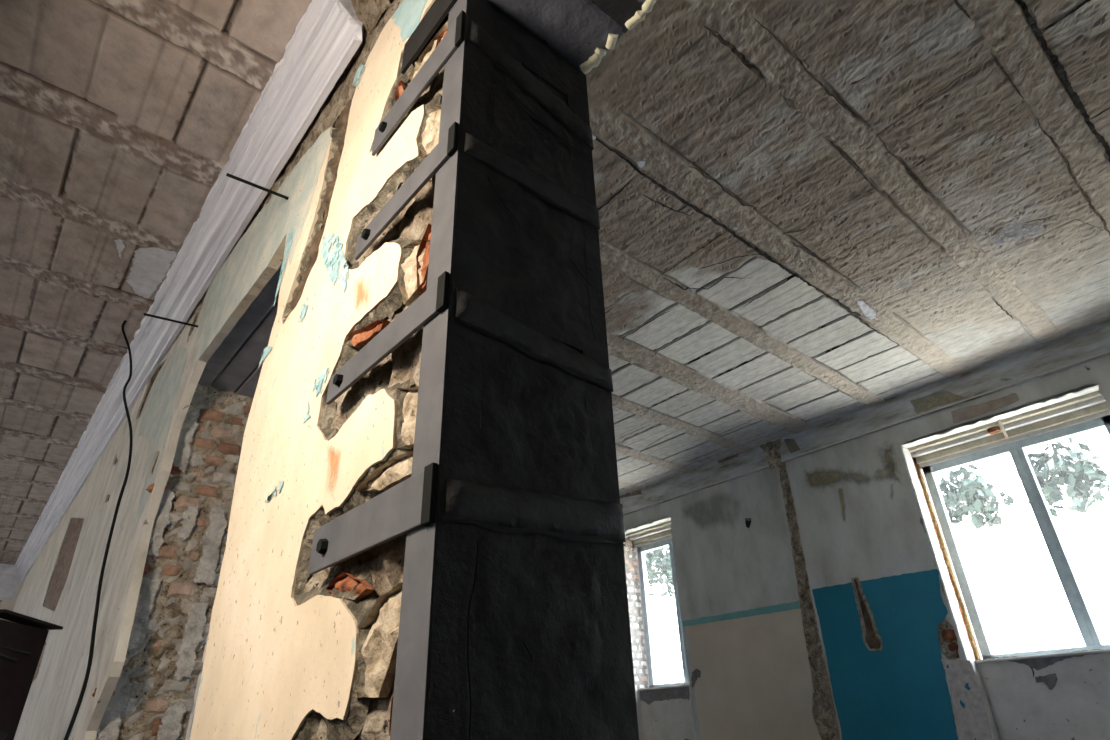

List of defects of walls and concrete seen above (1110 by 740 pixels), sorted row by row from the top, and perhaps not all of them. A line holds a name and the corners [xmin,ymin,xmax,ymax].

crack [755,0,1110,254]
flaking render [138,283,211,418]
flaking render [219,0,450,740]
flaking render [45,518,84,611]
flaking render [96,384,251,740]
flaking render [640,669,701,705]
spalling [779,439,830,740]
flaking render [851,577,882,651]
peeling [938,620,992,740]
flaking render [985,649,1104,690]